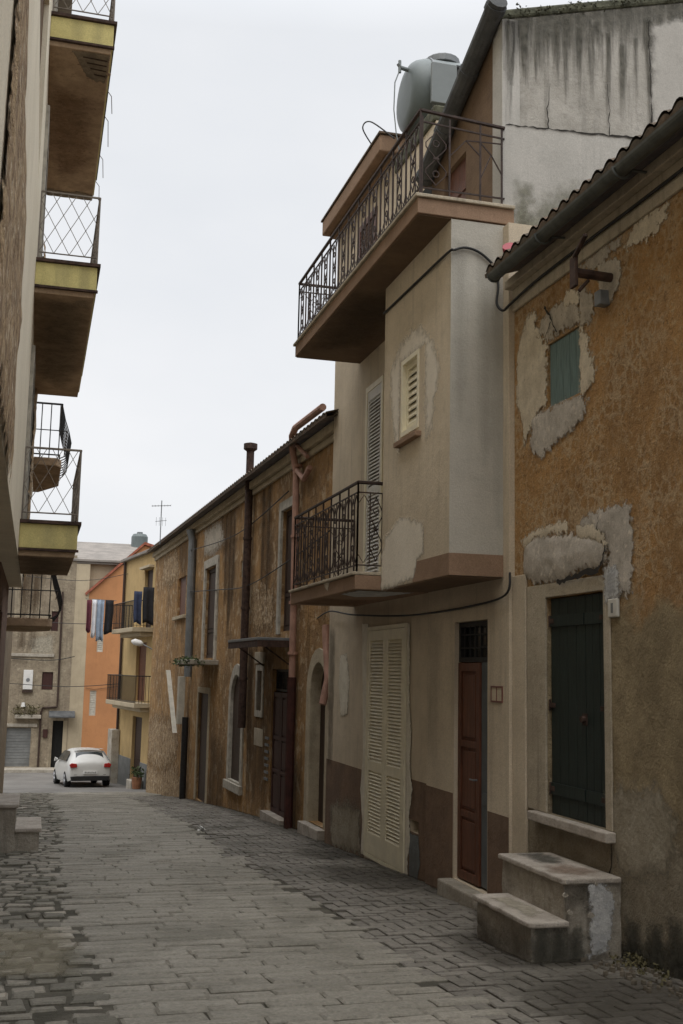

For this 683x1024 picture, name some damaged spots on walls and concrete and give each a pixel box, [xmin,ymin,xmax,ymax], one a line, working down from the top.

crack [506,20,653,139]
water stain [506,2,683,111]
peeling [516,310,597,460]
flaking render [520,519,621,603]
peeling [587,882,615,960]